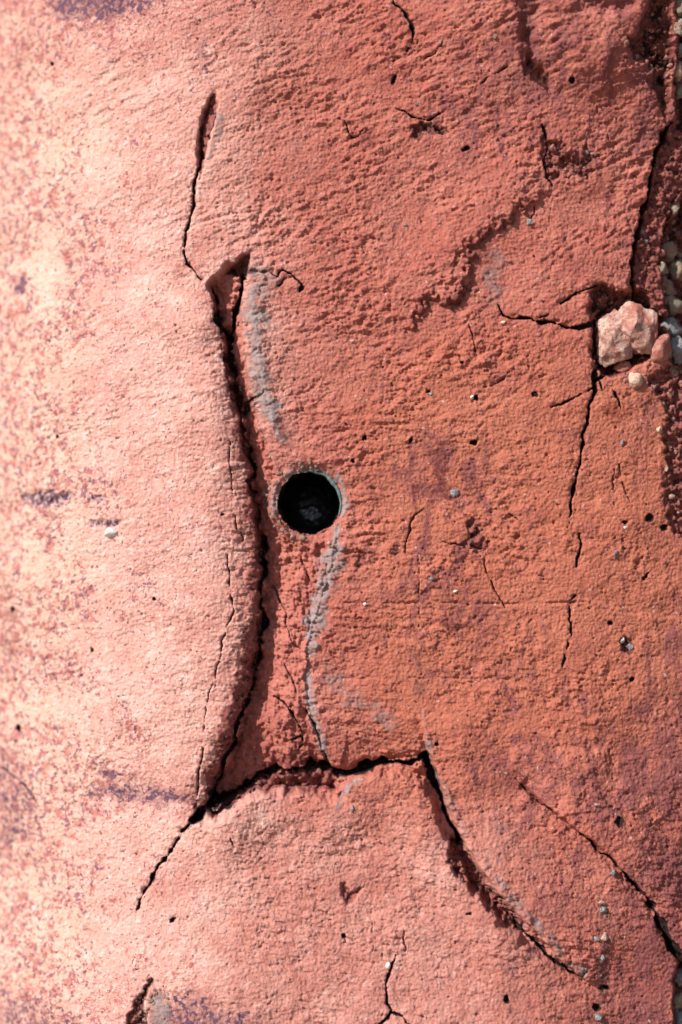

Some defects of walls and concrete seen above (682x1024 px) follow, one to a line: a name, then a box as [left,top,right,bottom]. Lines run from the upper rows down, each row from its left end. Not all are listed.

crack [397,109,441,121]
crack [541,124,552,186]
crack [629,122,672,300]
crack [498,284,597,331]
crack [551,369,621,567]
crack [137,163,463,910]
crack [562,595,576,668]
crack [371,923,408,1024]
crack [507,912,580,979]
crack [580,833,682,958]